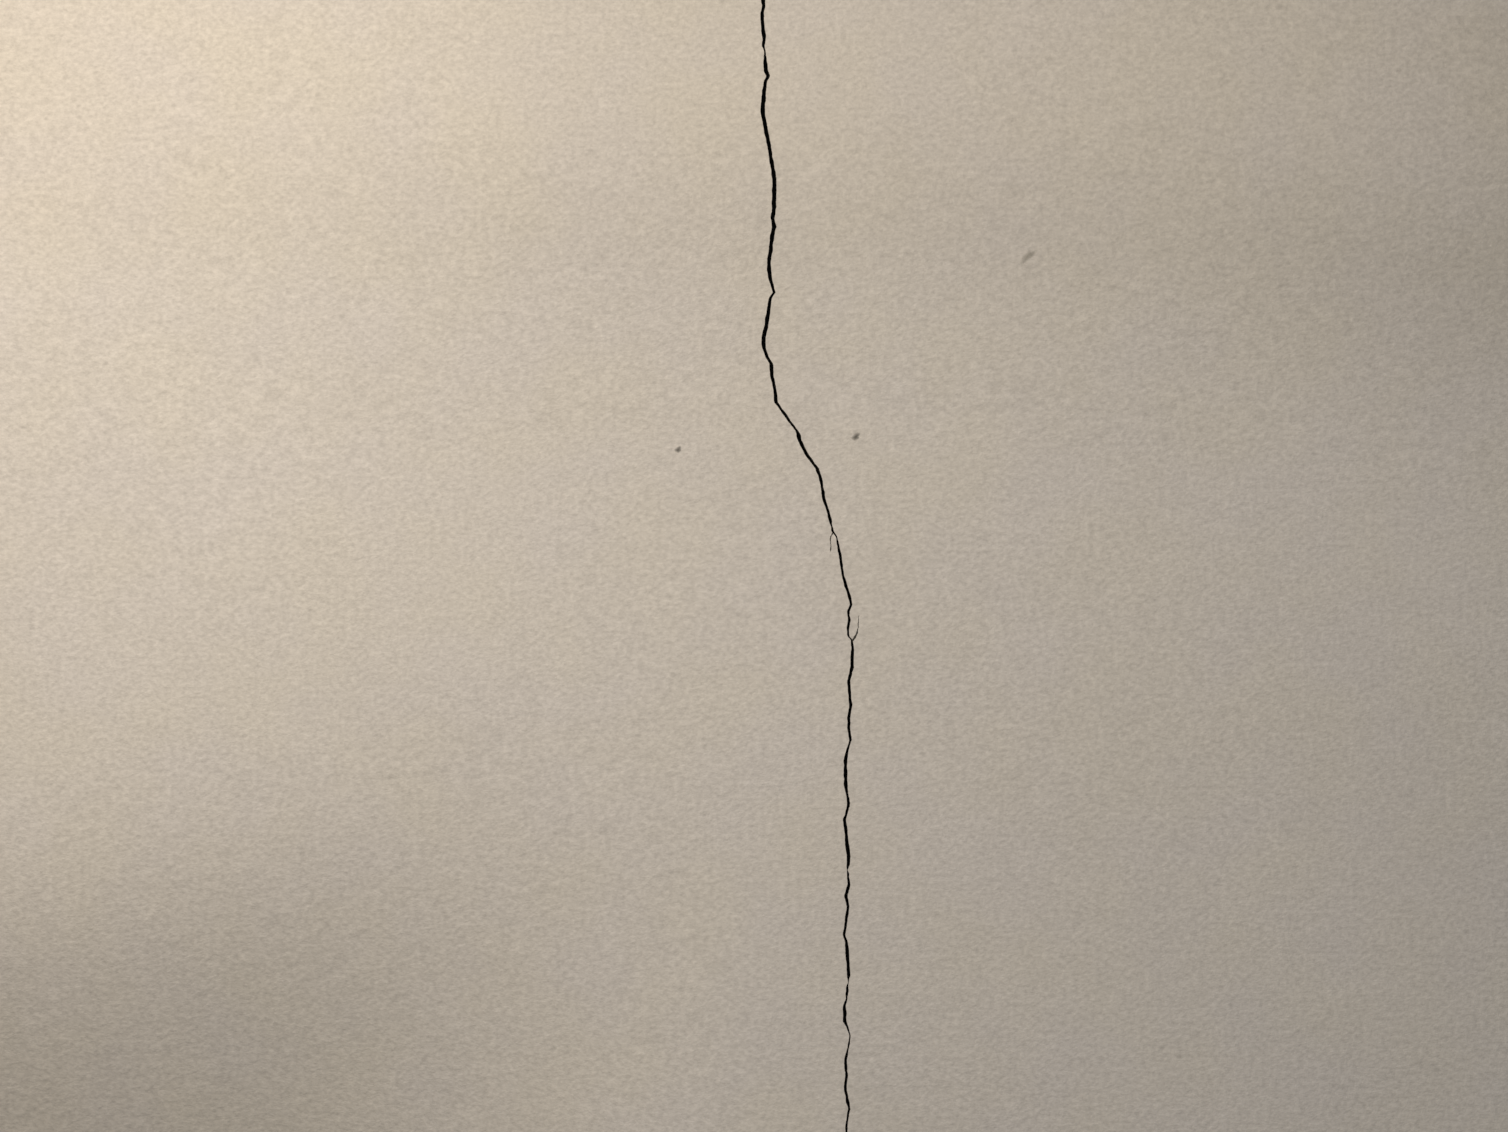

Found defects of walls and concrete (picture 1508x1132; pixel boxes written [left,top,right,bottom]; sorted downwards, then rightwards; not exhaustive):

crack [760,0,859,1132]